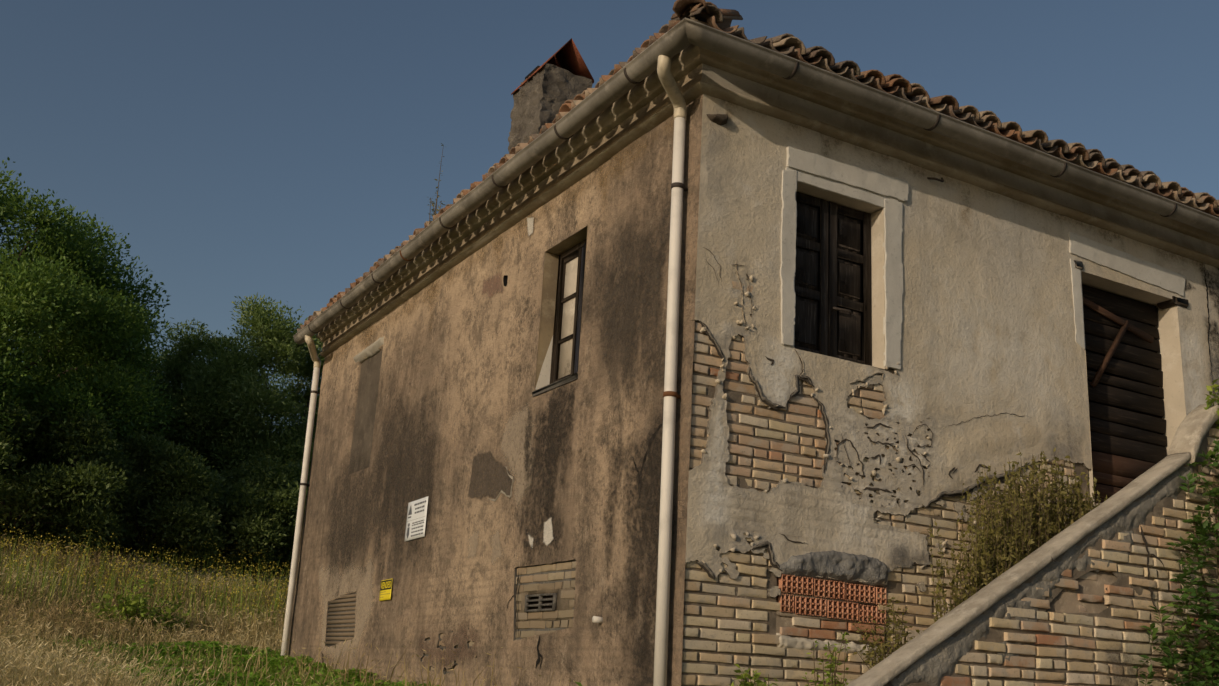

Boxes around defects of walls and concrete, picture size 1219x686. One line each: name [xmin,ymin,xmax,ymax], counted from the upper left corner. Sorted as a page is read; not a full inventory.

water stain [586,199,671,401]
water stain [1185,268,1219,394]
water stain [325,394,440,583]
peeling [468,408,535,503]
crack [506,571,542,670]
water stain [520,385,574,562]
water stain [604,414,675,686]
flaking render [681,274,1092,686]